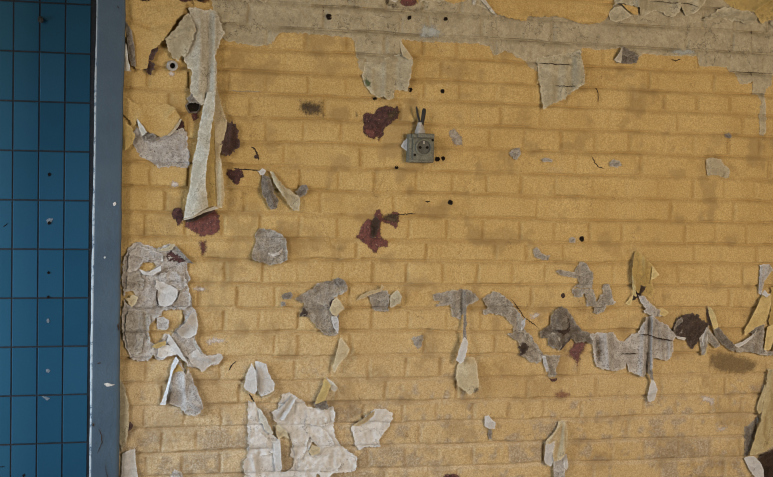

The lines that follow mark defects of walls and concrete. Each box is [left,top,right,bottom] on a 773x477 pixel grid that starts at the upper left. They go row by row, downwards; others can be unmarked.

flaking render [122,0,773,255]
peeling [117,242,223,416]
peeling [252,228,288,266]
peeling [243,278,393,477]
peeling [356,285,402,312]
peeling [544,420,569,477]
peeling [433,251,773,402]
peeling [744,368,773,477]